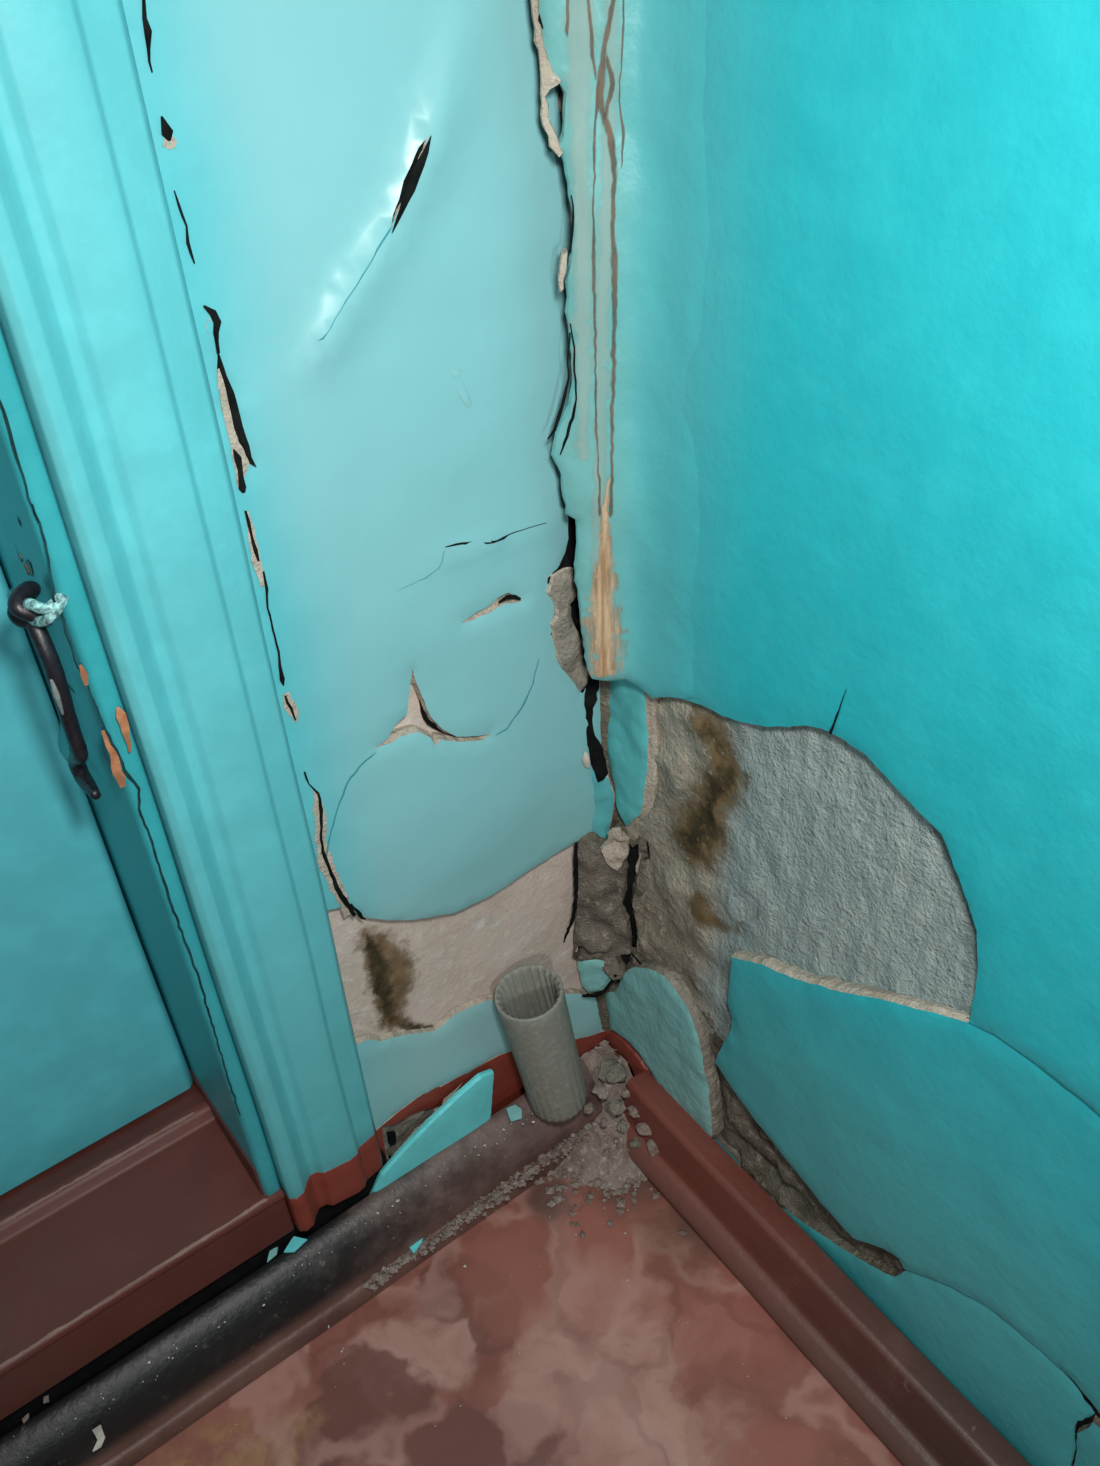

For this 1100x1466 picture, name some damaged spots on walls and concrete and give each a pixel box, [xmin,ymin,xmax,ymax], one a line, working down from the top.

crack [142,0,153,73]
crack [530,0,563,157]
crack [320,136,431,340]
crack [547,195,577,455]
rust [584,0,625,677]
crack [203,305,299,723]
crack [304,754,374,920]
damp [362,930,433,1031]
crack [399,516,650,998]
flaking render [328,680,978,1271]
damp [674,715,748,868]
damp [691,892,738,931]